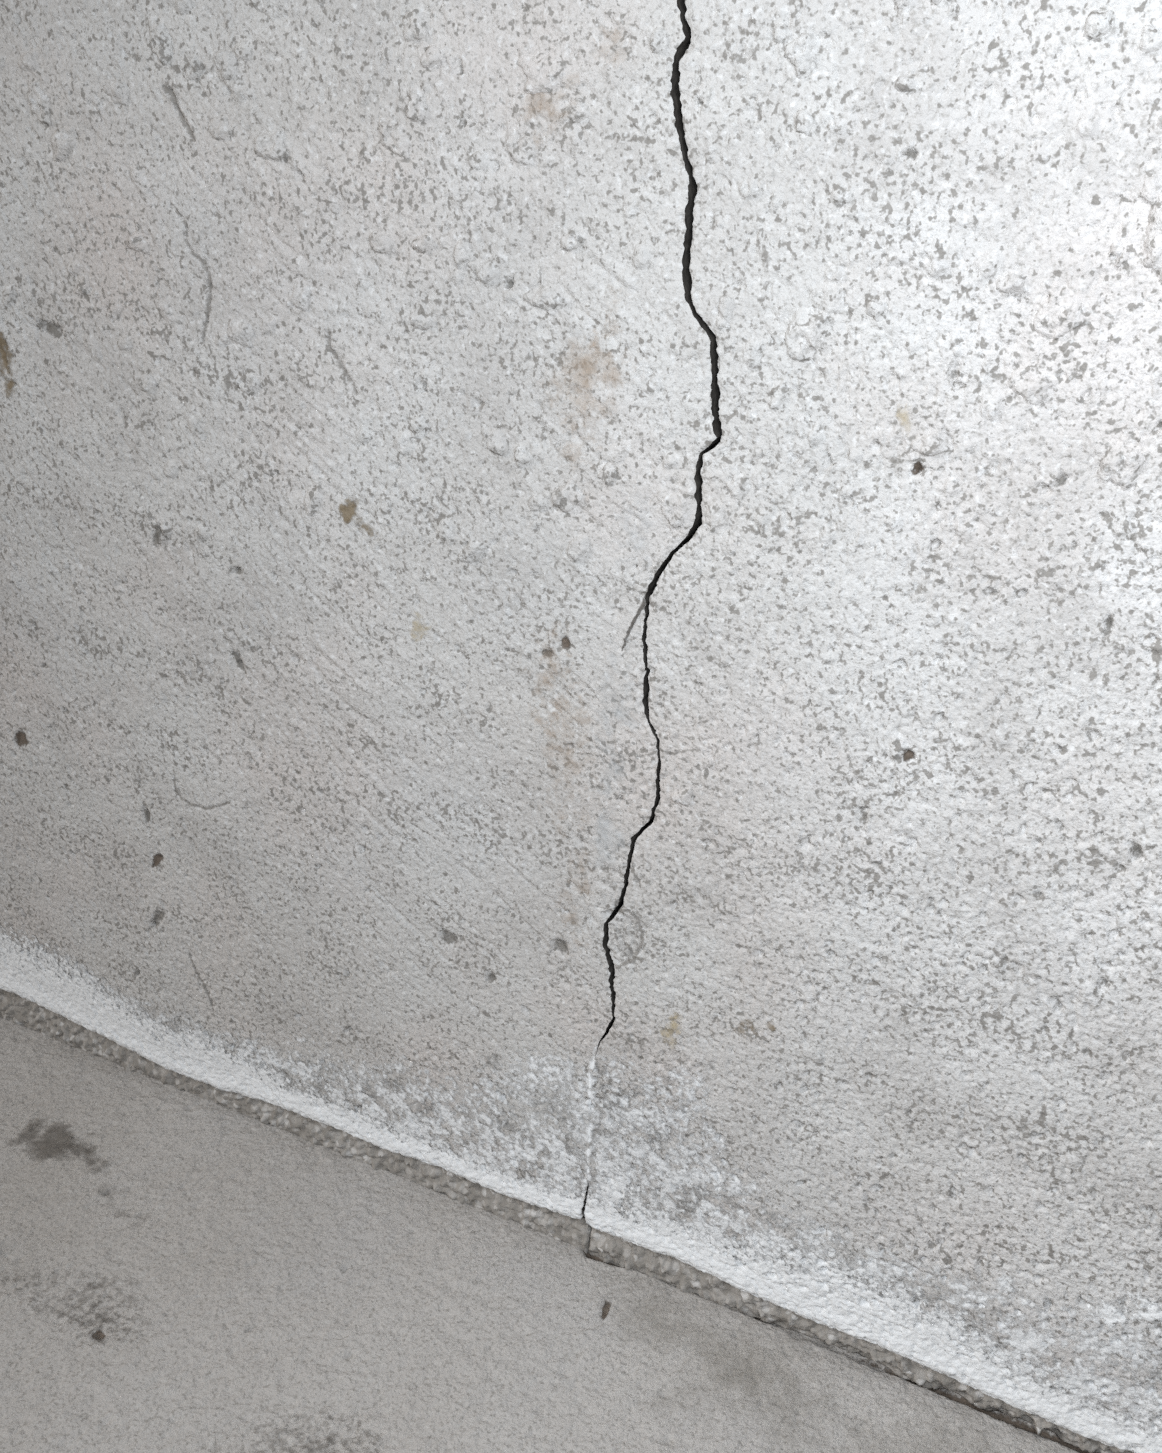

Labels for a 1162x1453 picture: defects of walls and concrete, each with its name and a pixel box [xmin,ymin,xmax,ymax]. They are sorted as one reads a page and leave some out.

crack [596,0,722,1053]
crack [582,1181,615,1266]